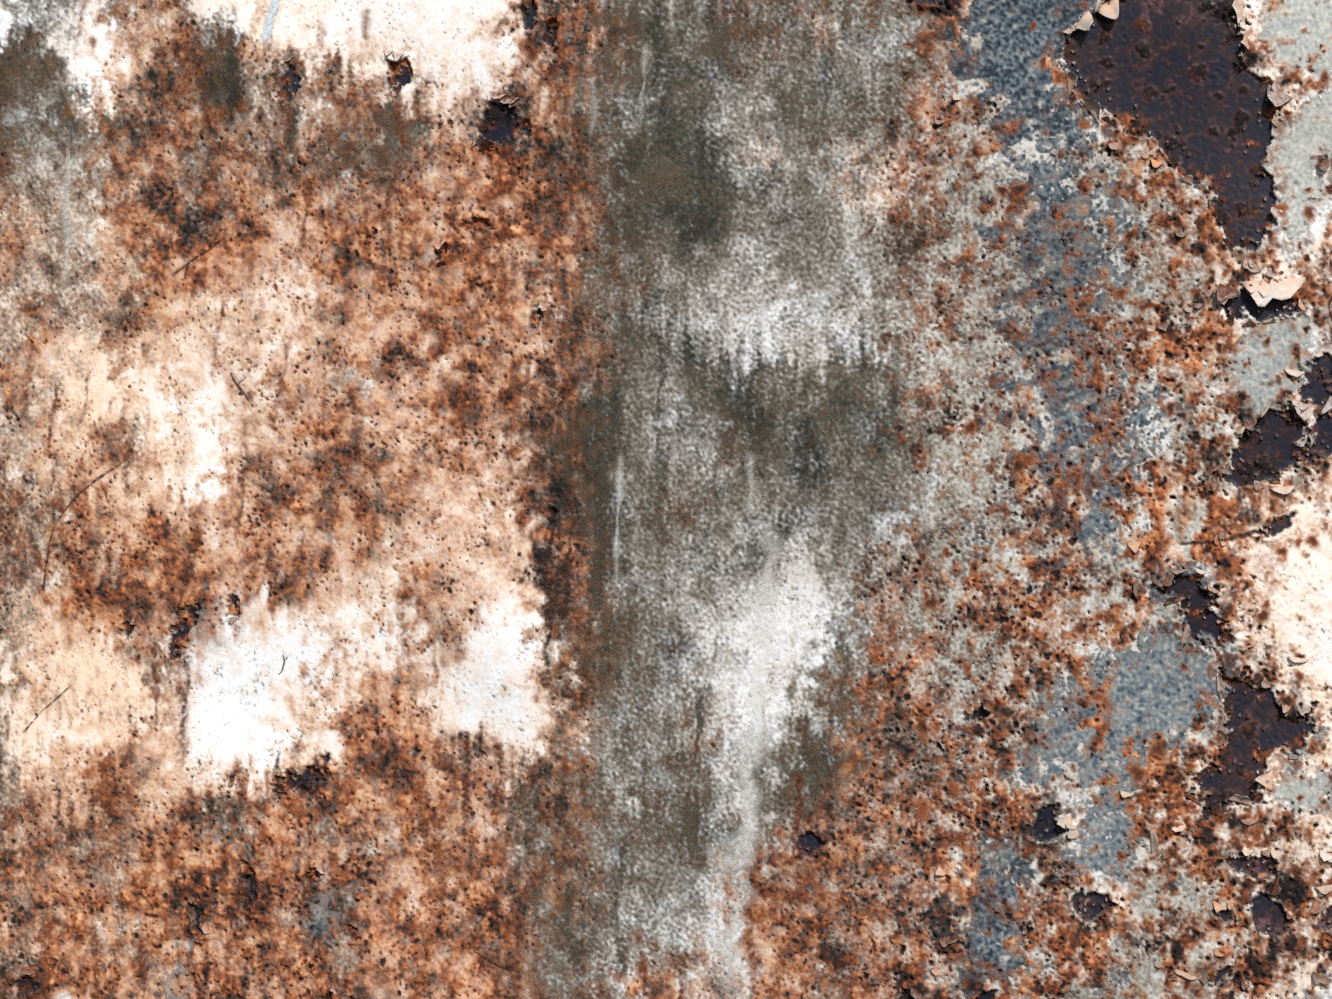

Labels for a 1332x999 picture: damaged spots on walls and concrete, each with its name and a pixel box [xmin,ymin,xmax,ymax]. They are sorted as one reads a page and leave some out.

peeling [471,94,531,152]
peeling [1063,0,1292,252]
water stain [957,236,996,288]
peeling [1218,350,1332,492]
corrosion [0,0,615,999]
water stain [494,0,949,999]
corrosion [619,0,1332,999]
peeling [1255,508,1295,538]
peeling [1185,666,1318,820]
peeling [895,987,923,999]
peeling [967,989,998,999]